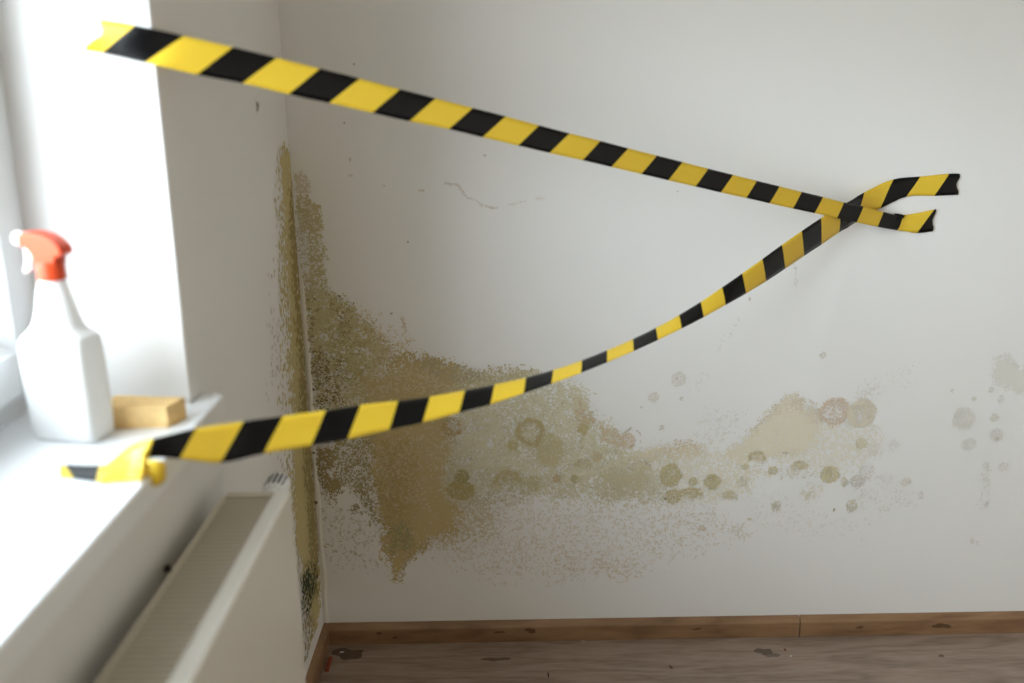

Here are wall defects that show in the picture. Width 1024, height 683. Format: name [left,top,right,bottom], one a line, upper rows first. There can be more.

damp [266,142,542,418]
damp [270,361,925,661]